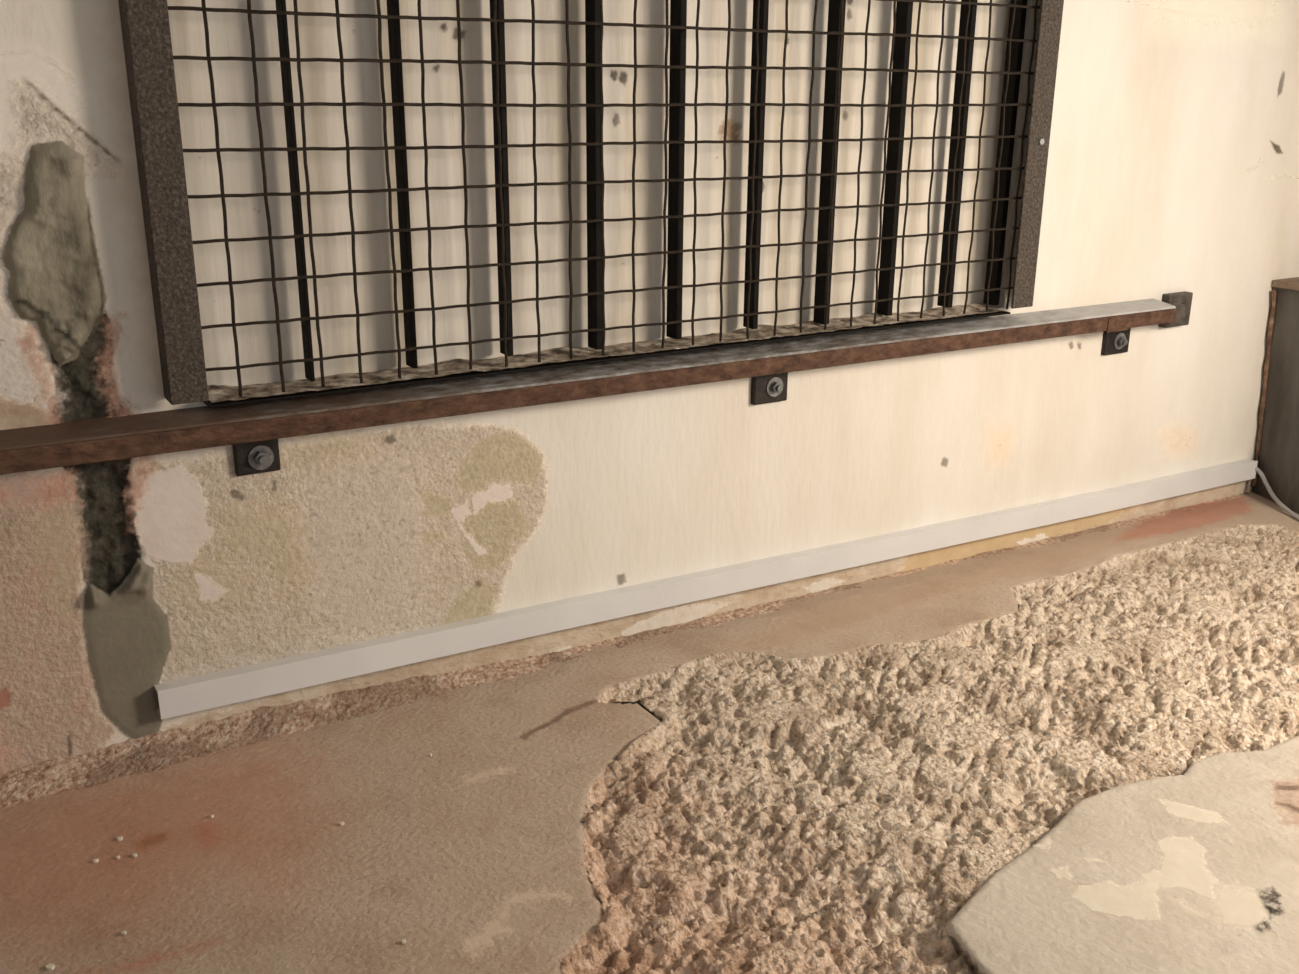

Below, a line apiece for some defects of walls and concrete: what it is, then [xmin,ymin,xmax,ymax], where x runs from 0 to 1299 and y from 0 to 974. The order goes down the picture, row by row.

flaking render [11,84,113,168]
flaking render [0,288,57,430]
flaking render [132,424,549,683]
crack [523,701,596,739]
flaking render [169,479,1253,730]
spalling [560,524,1299,974]